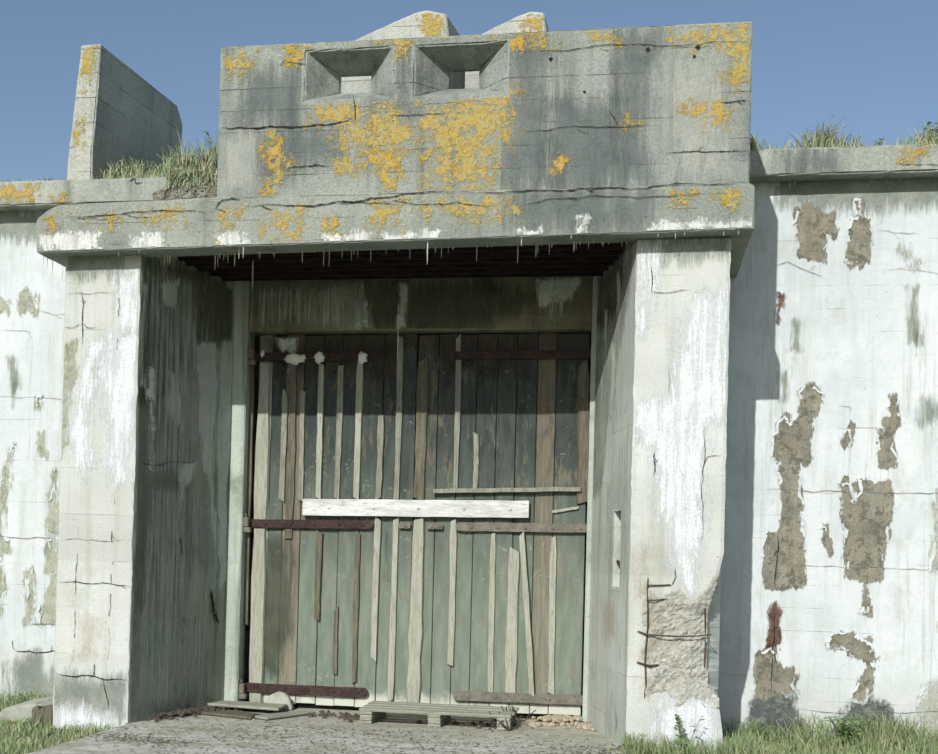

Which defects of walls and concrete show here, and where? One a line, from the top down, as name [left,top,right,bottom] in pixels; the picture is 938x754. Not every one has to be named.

crack [220,97,356,129]
crack [535,112,645,133]
crack [69,182,751,220]
peeling [791,198,875,271]
peeling [759,381,825,592]
peeling [819,393,902,618]
peeling [23,469,59,627]
crack [0,531,130,701]
spalling [637,576,719,708]
rust [765,602,782,650]
peeling [749,645,800,702]
spalling [824,630,879,663]